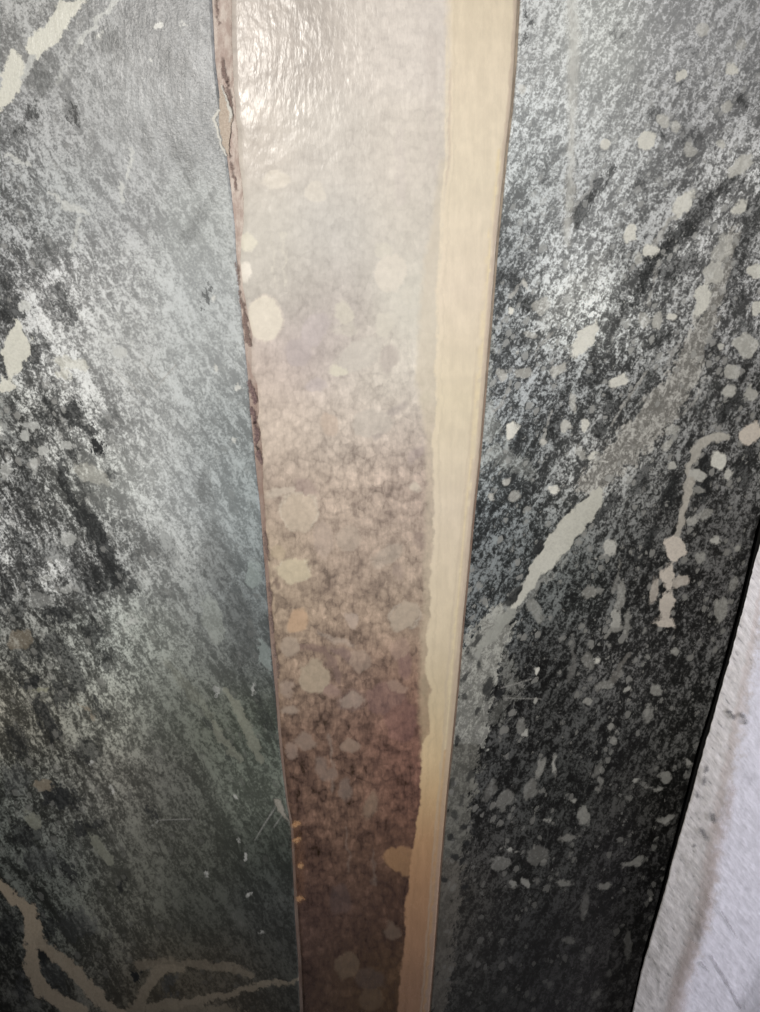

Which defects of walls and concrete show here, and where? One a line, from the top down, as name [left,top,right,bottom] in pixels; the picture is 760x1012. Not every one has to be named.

spalling [212,59,237,189]